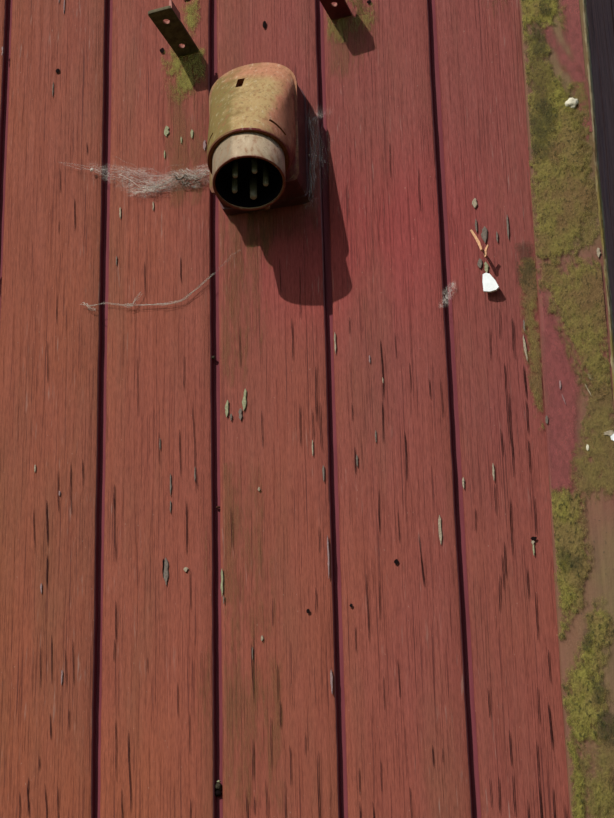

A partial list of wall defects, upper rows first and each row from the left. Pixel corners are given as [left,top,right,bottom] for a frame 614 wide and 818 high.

peeling [225,388,247,420]